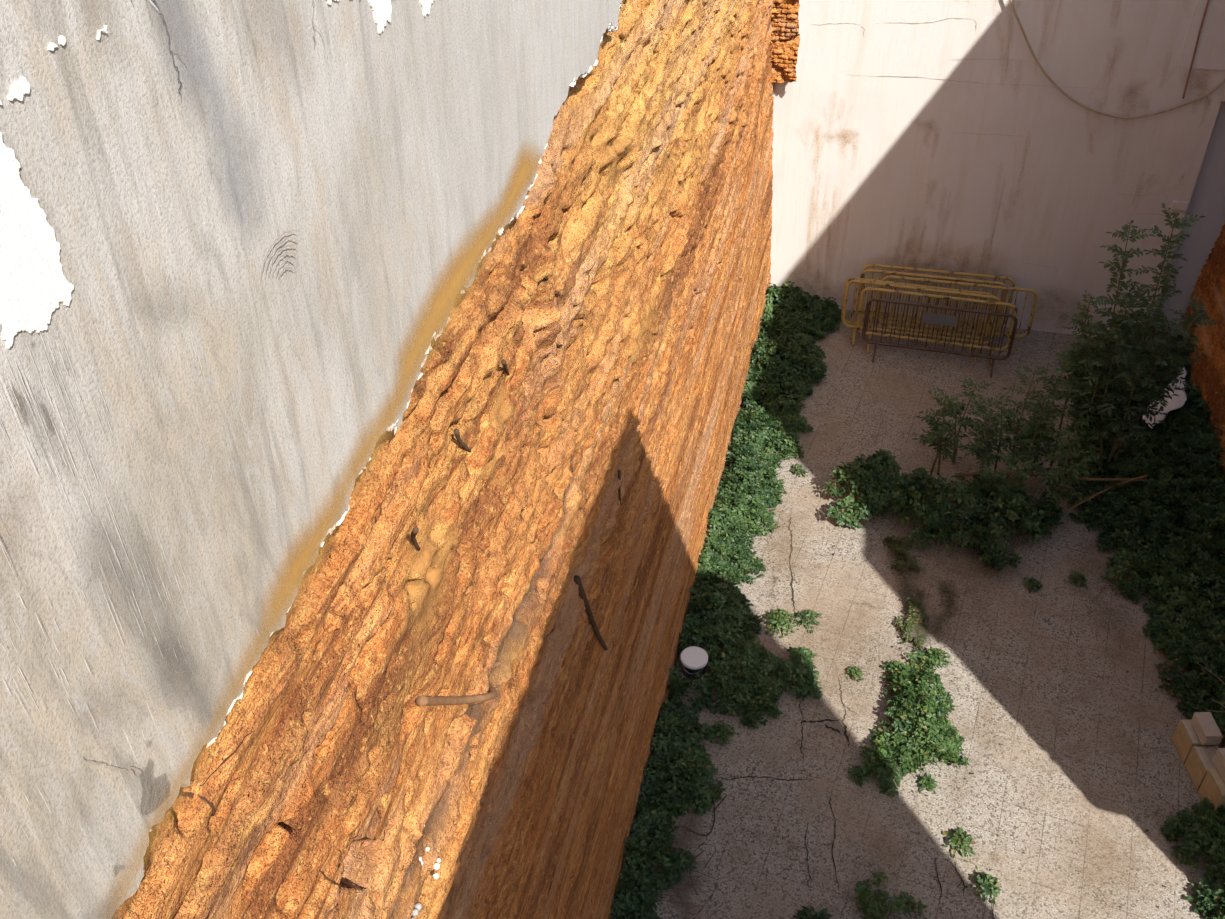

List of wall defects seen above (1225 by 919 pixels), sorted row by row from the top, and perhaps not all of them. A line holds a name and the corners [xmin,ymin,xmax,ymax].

peeling [47,35,66,51]
peeling [368,0,392,33]
peeling [419,0,435,17]
peeling [0,77,30,105]
peeling [0,132,74,349]
crack [788,515,797,616]
crack [717,676,857,890]
crack [933,856,994,919]